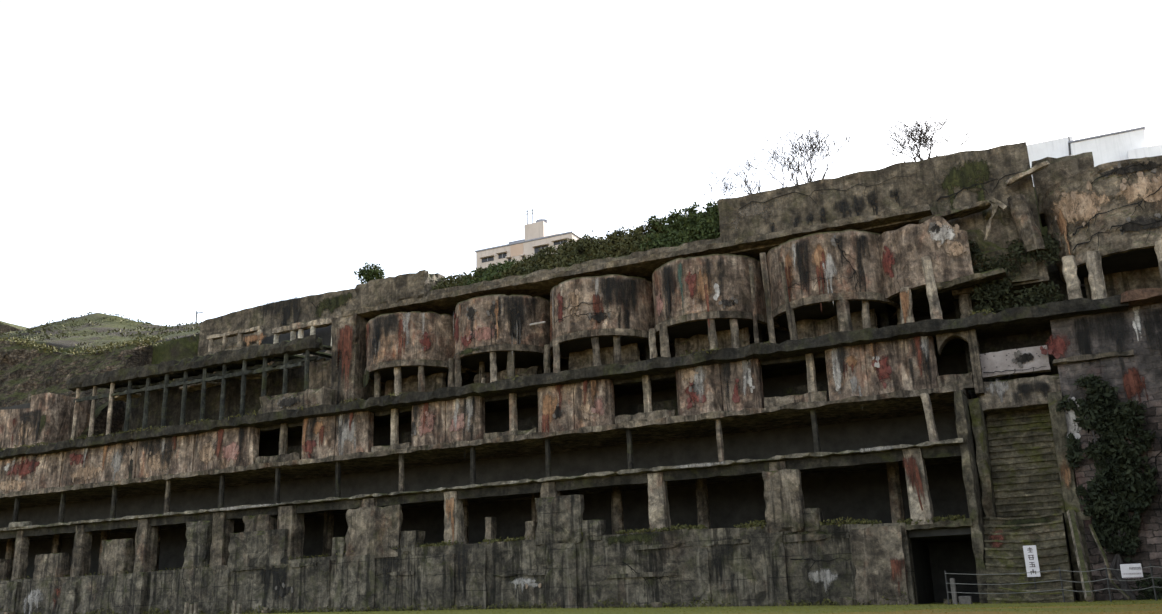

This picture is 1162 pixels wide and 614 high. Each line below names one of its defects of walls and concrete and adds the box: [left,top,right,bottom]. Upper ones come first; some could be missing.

corrosion [812,243,827,311]
corrosion [542,384,563,443]
damp [260,556,287,599]
damp [380,546,401,598]
damp [512,578,536,592]